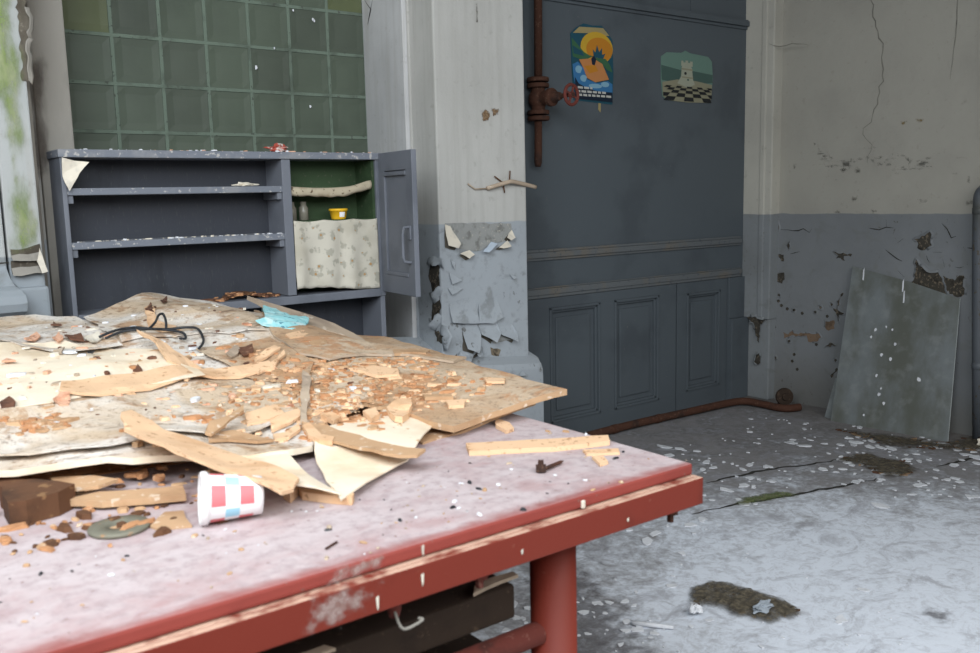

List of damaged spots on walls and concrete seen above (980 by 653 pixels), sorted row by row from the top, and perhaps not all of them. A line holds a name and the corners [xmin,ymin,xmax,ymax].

crack [863,1,884,159]
peeling [912,230,968,297]
peeling [427,256,519,362]
crack [707,459,836,483]
crack [694,478,877,514]